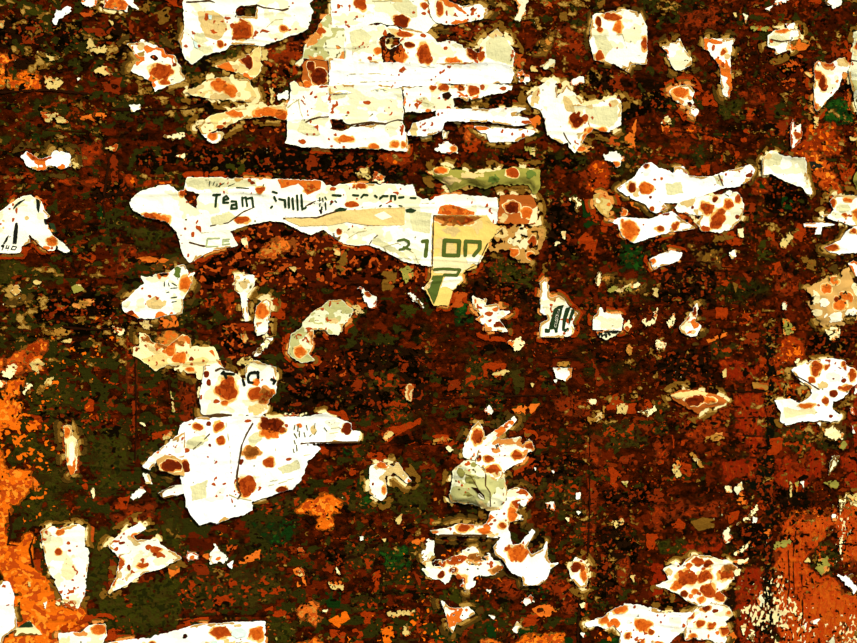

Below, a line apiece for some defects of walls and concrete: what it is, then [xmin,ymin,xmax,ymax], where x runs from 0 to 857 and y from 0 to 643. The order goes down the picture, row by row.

peeling [803,150,855,199]
peeling [0,337,50,429]
peeling [294,491,344,531]
rust [7,505,47,574]
peeling [0,448,87,643]
rust [96,555,133,608]
rust [58,590,95,639]